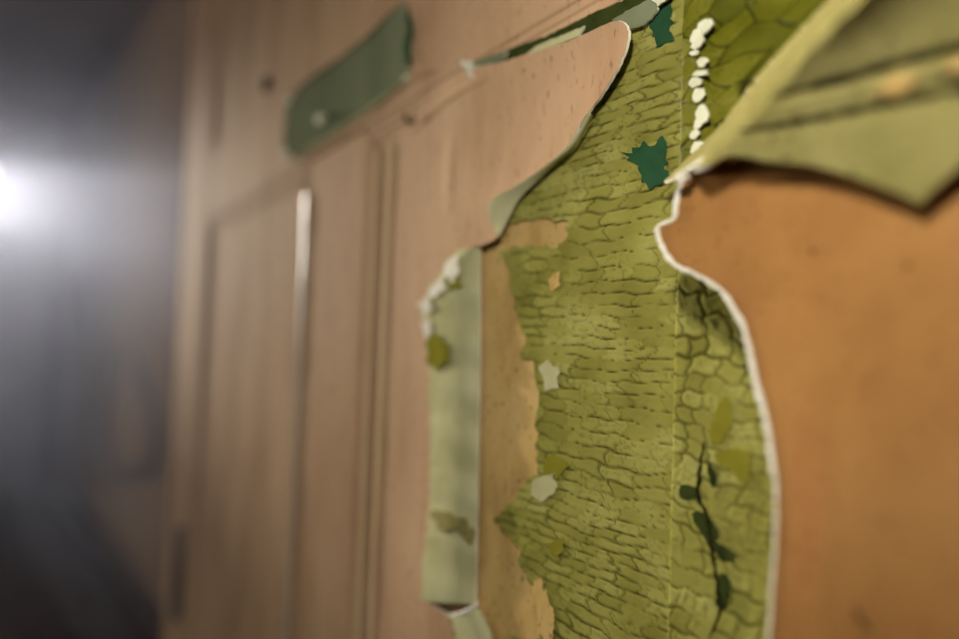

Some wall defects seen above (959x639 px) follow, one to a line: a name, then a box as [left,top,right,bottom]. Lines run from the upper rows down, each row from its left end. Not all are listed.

spalling [281,2,413,160]
peeling [374,0,959,639]